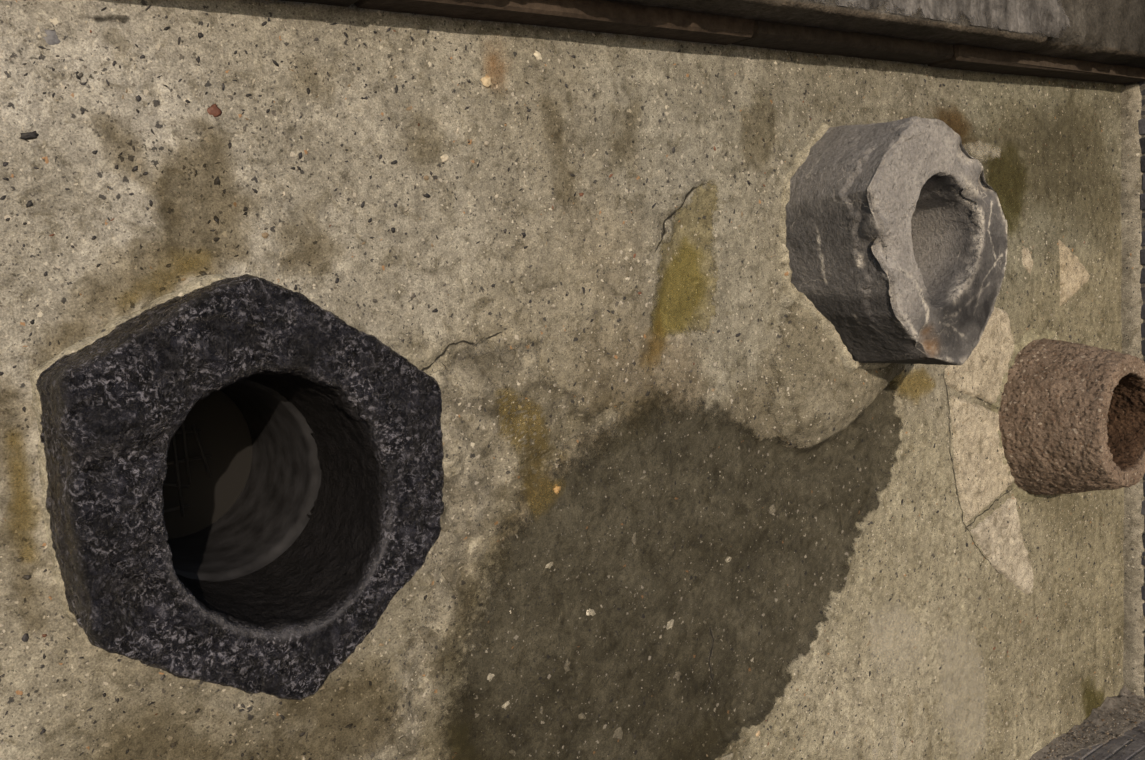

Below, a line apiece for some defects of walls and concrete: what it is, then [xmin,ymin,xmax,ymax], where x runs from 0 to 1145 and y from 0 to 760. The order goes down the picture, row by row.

crack [421,332,502,376]
leakage [869,607,923,674]